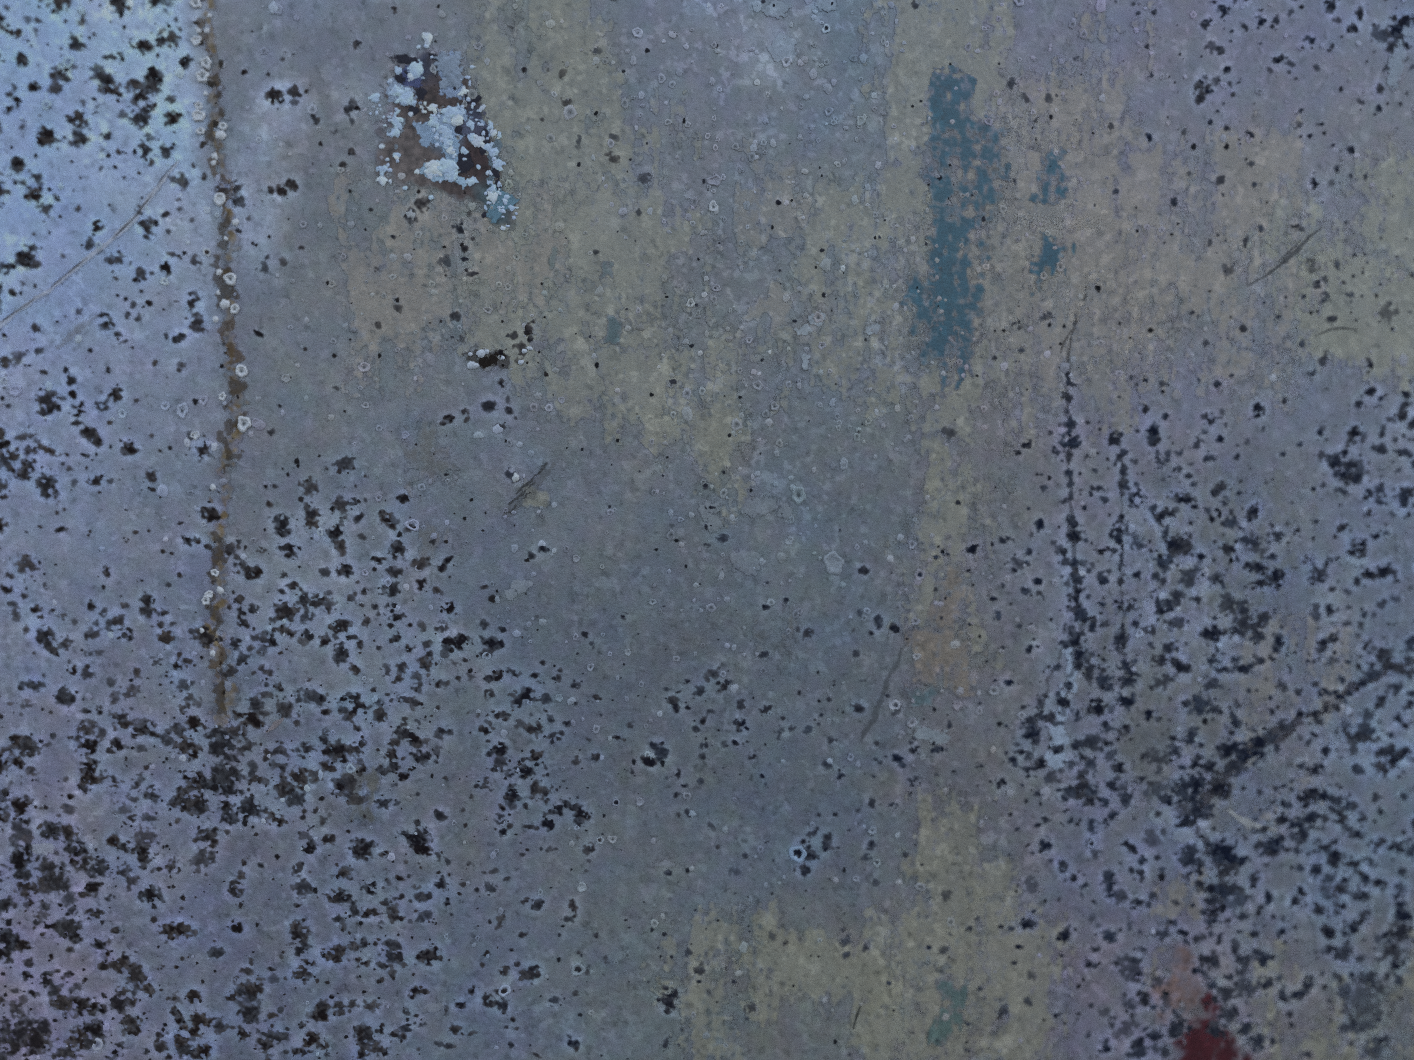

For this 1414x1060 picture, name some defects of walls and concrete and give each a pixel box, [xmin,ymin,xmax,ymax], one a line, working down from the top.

mould [0,156,60,222]
leakage [0,0,193,180]
leakage [134,163,298,239]
mould [261,235,287,273]
peeling [357,32,519,231]
corrosion [193,0,250,736]
leakage [327,0,1414,1060]
leakage [0,456,603,1060]